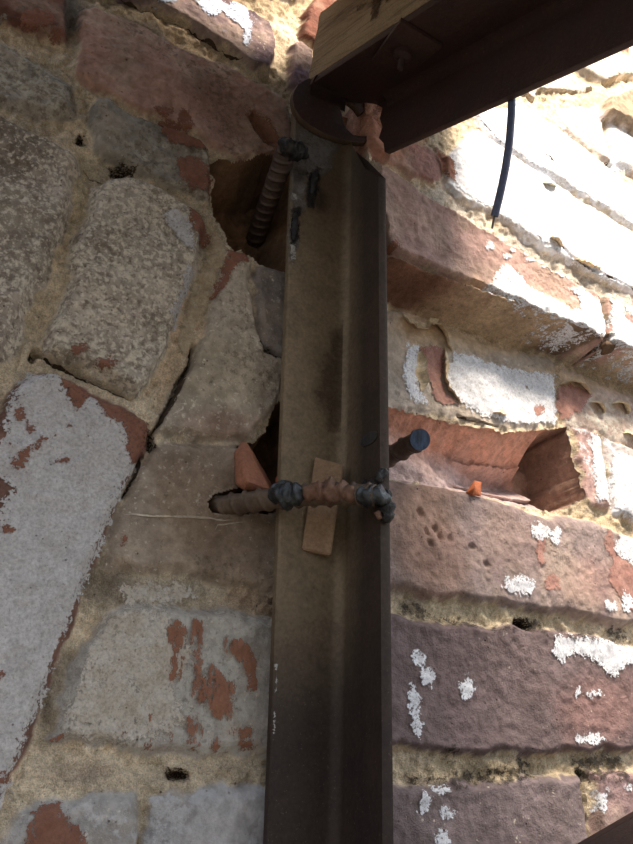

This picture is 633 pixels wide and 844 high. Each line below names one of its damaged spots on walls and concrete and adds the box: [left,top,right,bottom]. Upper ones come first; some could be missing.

spalling [154,105,297,300]
peeling [434,106,633,288]
peeling [481,248,633,384]
peeling [93,355,118,371]
spalling [237,401,280,484]
spalling [388,314,631,513]
spalling [210,487,250,499]
peeling [501,520,562,597]
peeling [604,529,633,613]